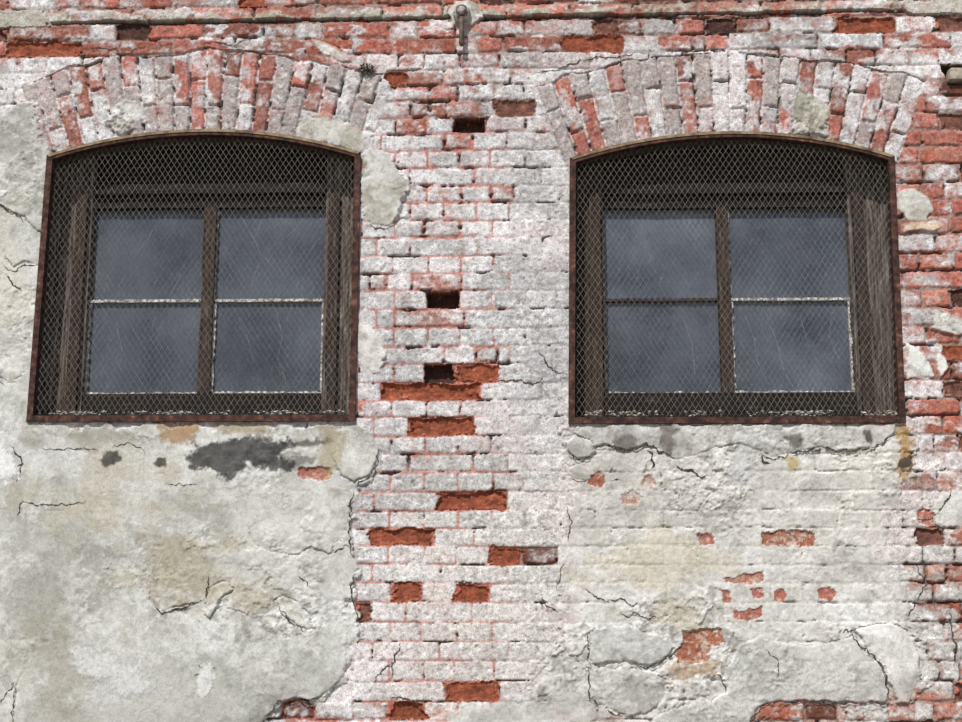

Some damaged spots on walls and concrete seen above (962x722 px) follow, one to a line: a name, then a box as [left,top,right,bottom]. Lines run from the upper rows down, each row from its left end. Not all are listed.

spalling [0,27,84,58]
peeling [0,154,46,268]
crack [11,442,146,514]
spalling [435,489,508,512]
spalling [366,526,436,546]
spalling [487,544,527,567]
crack [631,650,677,669]
crack [587,634,626,716]
crack [750,629,898,722]
spalling [443,679,500,702]
crack [263,693,327,722]
spalling [388,700,431,720]